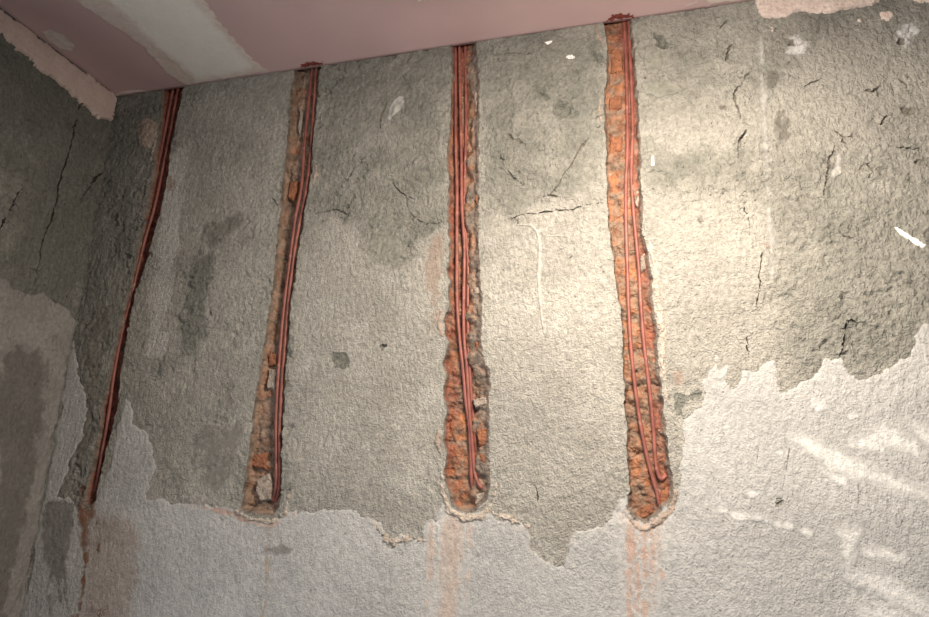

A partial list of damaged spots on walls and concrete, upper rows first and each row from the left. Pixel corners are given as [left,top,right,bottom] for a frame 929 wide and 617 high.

crack [720,20,734,61]
peeling [879,11,894,21]
crack [733,73,749,159]
crack [863,78,909,97]
crack [34,105,103,284]
crack [823,131,856,196]
crack [755,253,763,307]
corrosion [612,492,675,617]